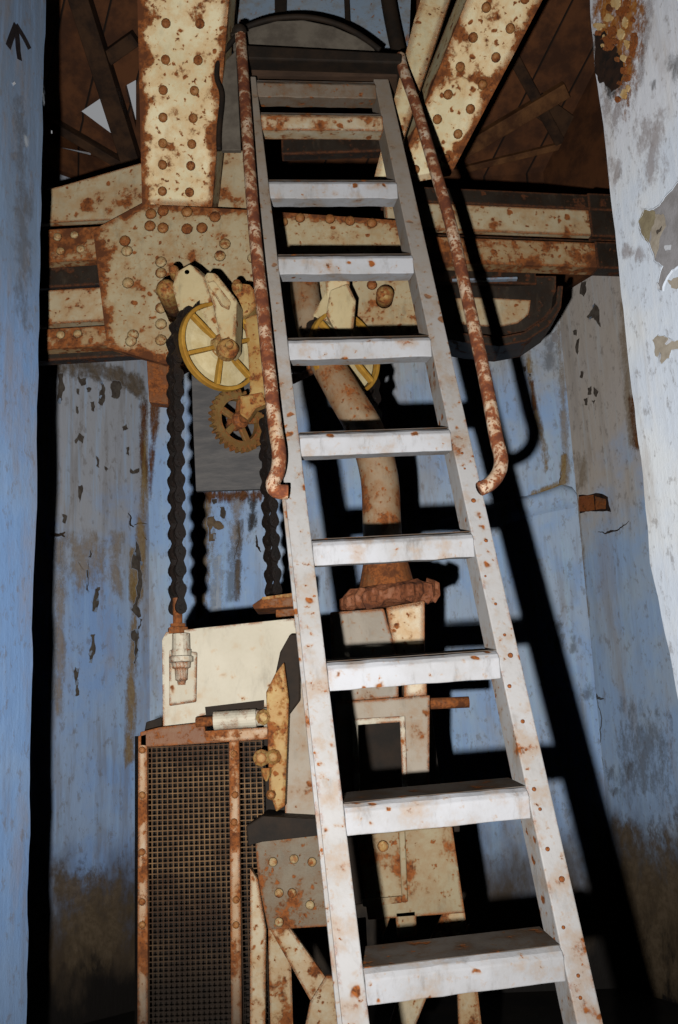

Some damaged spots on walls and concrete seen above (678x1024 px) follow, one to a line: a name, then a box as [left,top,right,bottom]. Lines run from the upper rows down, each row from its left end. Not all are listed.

spalling [593,0,647,107]
peeling [638,181,678,293]
peeling [652,334,678,364]
peeling [57,373,122,414]
peeling [580,371,599,406]
peeling [86,550,100,612]
peeling [130,541,143,664]
peeling [73,634,96,697]